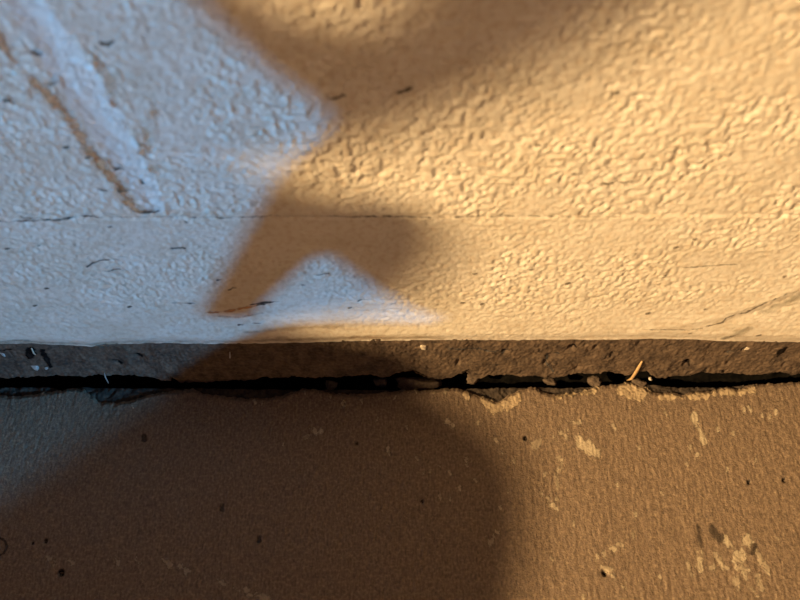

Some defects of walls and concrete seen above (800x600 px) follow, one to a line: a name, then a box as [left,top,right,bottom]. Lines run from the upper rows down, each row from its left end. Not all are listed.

crack [0,348,800,391]
spalling [462,388,526,415]
spalling [536,386,600,399]
spalling [617,382,757,403]